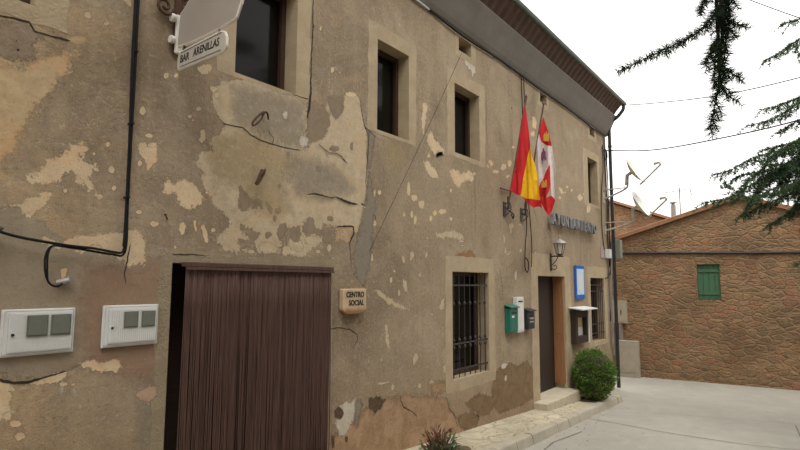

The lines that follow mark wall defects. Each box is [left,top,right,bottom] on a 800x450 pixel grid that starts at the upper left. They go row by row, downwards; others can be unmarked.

crack [0,15,70,41]
flaking render [0,35,88,163]
crack [223,123,298,150]
flaking render [160,79,381,257]
crack [307,101,376,219]
flaking render [42,226,147,268]
crack [337,225,354,259]
flaking render [28,371,75,387]
flaking render [78,358,122,373]
flaking render [0,377,26,441]
spalling [330,360,533,450]